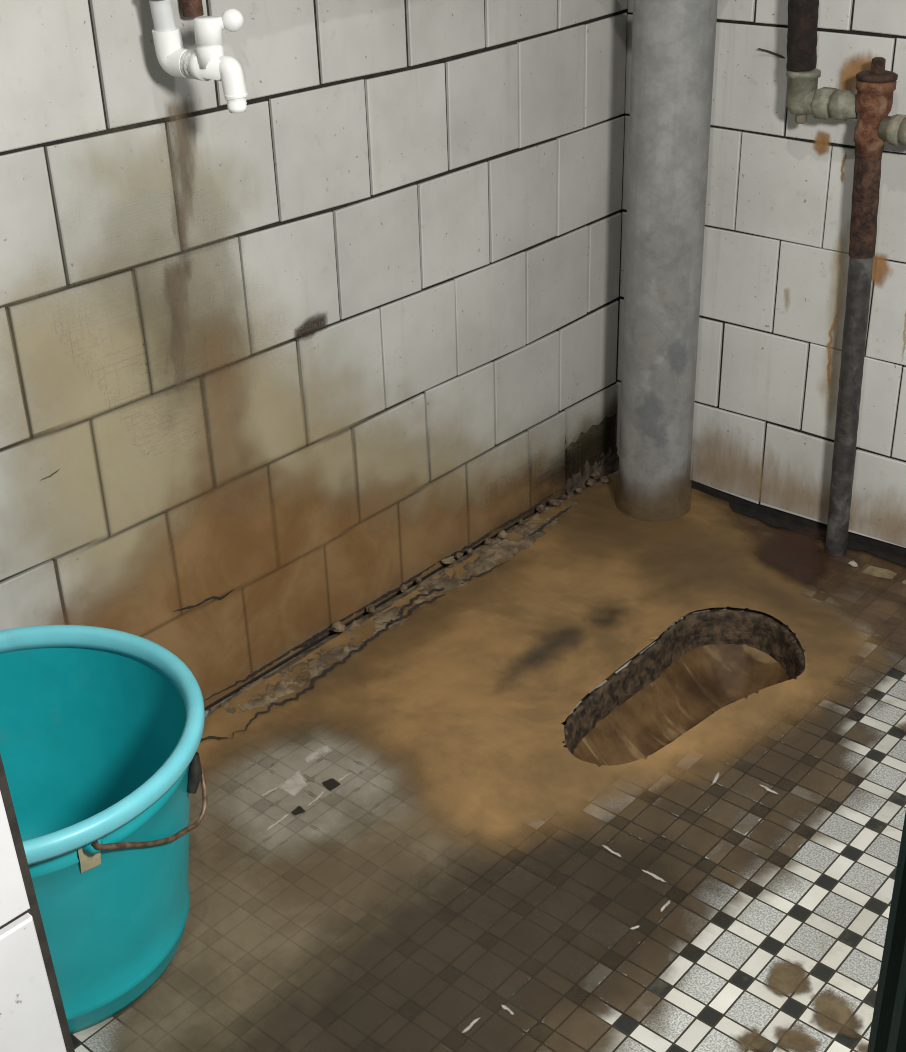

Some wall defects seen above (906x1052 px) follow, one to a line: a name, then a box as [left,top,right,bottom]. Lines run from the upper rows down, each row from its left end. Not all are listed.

corrosion [840,57,872,91]
water stain [11,104,618,708]
spalling [210,383,619,714]